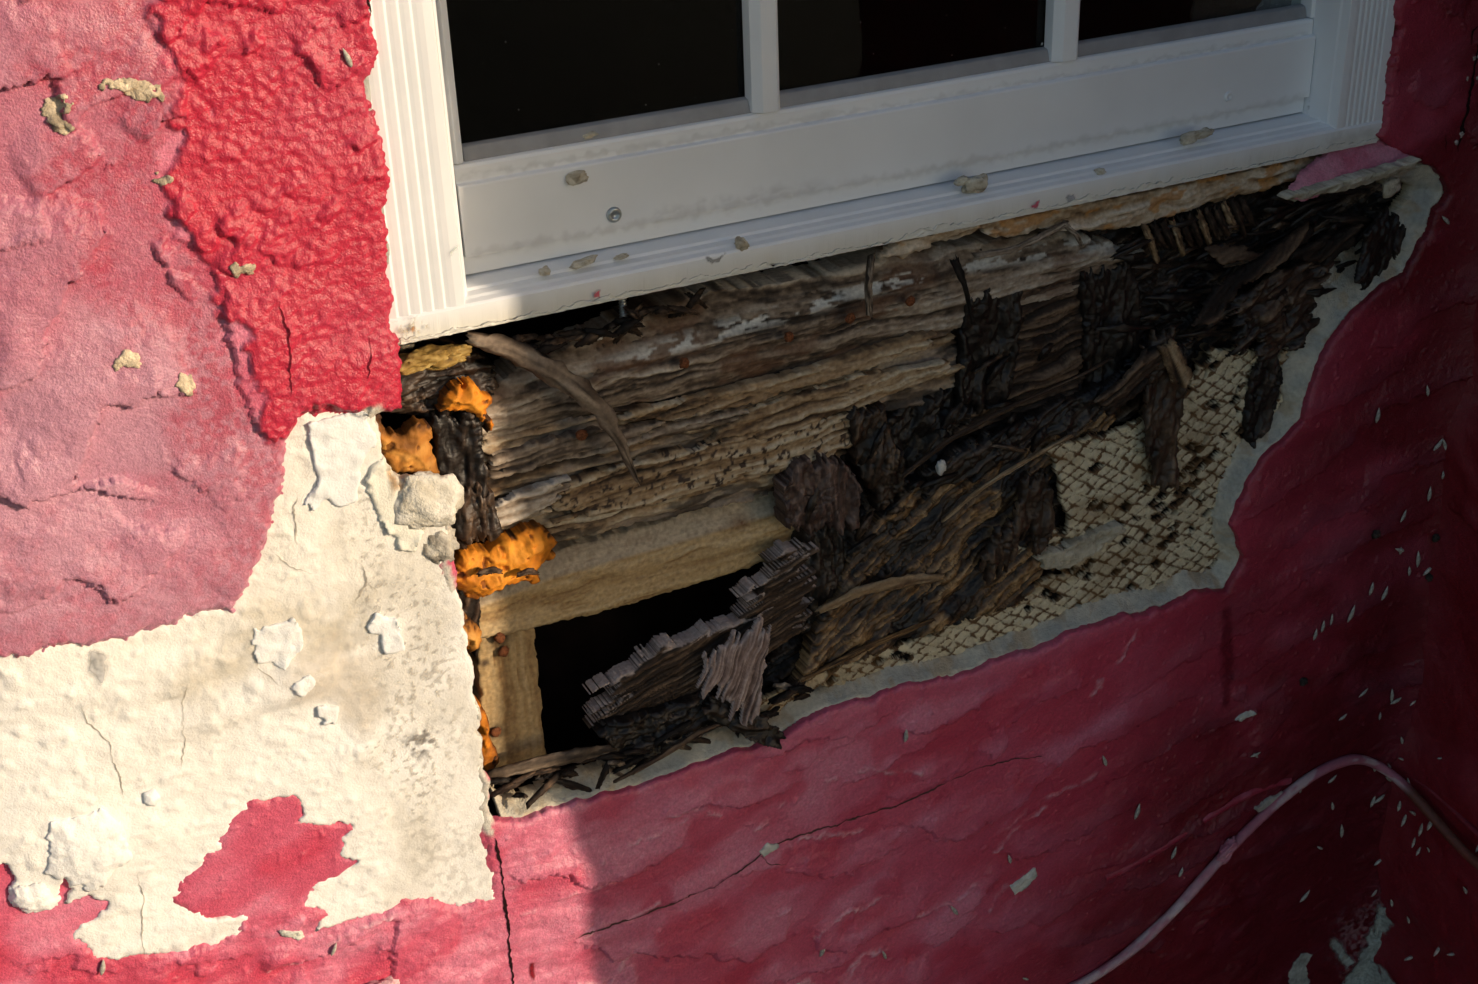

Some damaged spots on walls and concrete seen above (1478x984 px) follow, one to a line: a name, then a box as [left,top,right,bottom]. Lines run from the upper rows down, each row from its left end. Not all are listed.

flaking render [98,77,165,103]
crack [1445,26,1478,148]
flaking render [40,94,75,136]
flaking render [151,171,174,186]
flaking render [229,262,256,279]
flaking render [112,349,142,372]
flaking render [175,372,196,397]
spalling [399,138,1444,732]
peeling [0,411,766,960]
crack [495,838,514,984]